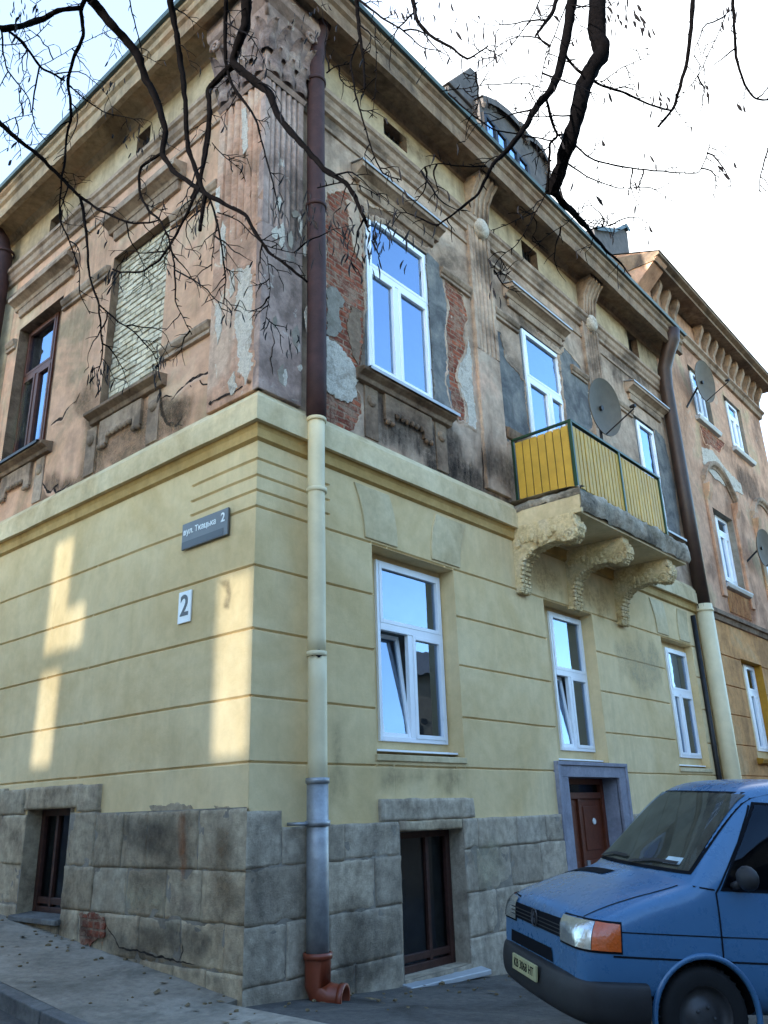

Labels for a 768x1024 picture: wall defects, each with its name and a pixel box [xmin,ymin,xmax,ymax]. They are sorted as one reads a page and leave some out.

peeling [215,186,257,395]
flaking render [325,187,434,434]
flaking render [442,279,469,424]
spalling [79,911,106,947]
crack [105,924,194,965]